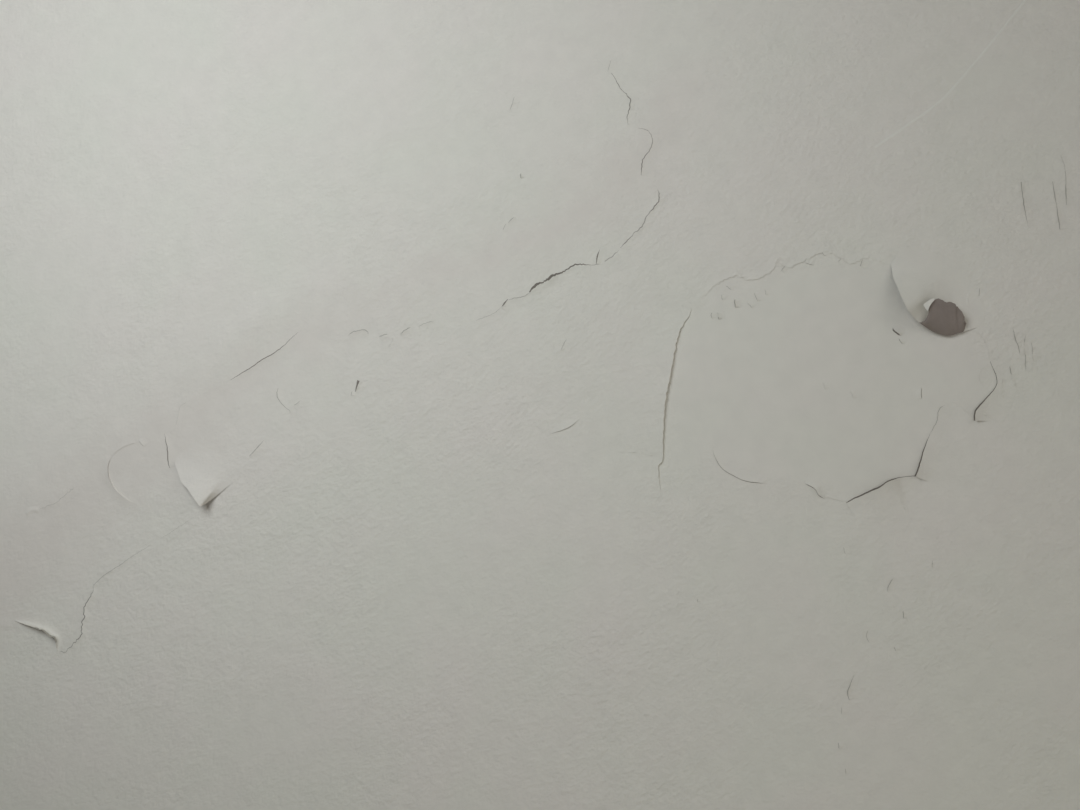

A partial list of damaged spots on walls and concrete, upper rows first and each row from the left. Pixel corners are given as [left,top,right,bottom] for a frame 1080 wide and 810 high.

crack [474,59,667,328]
peeling [164,332,303,506]